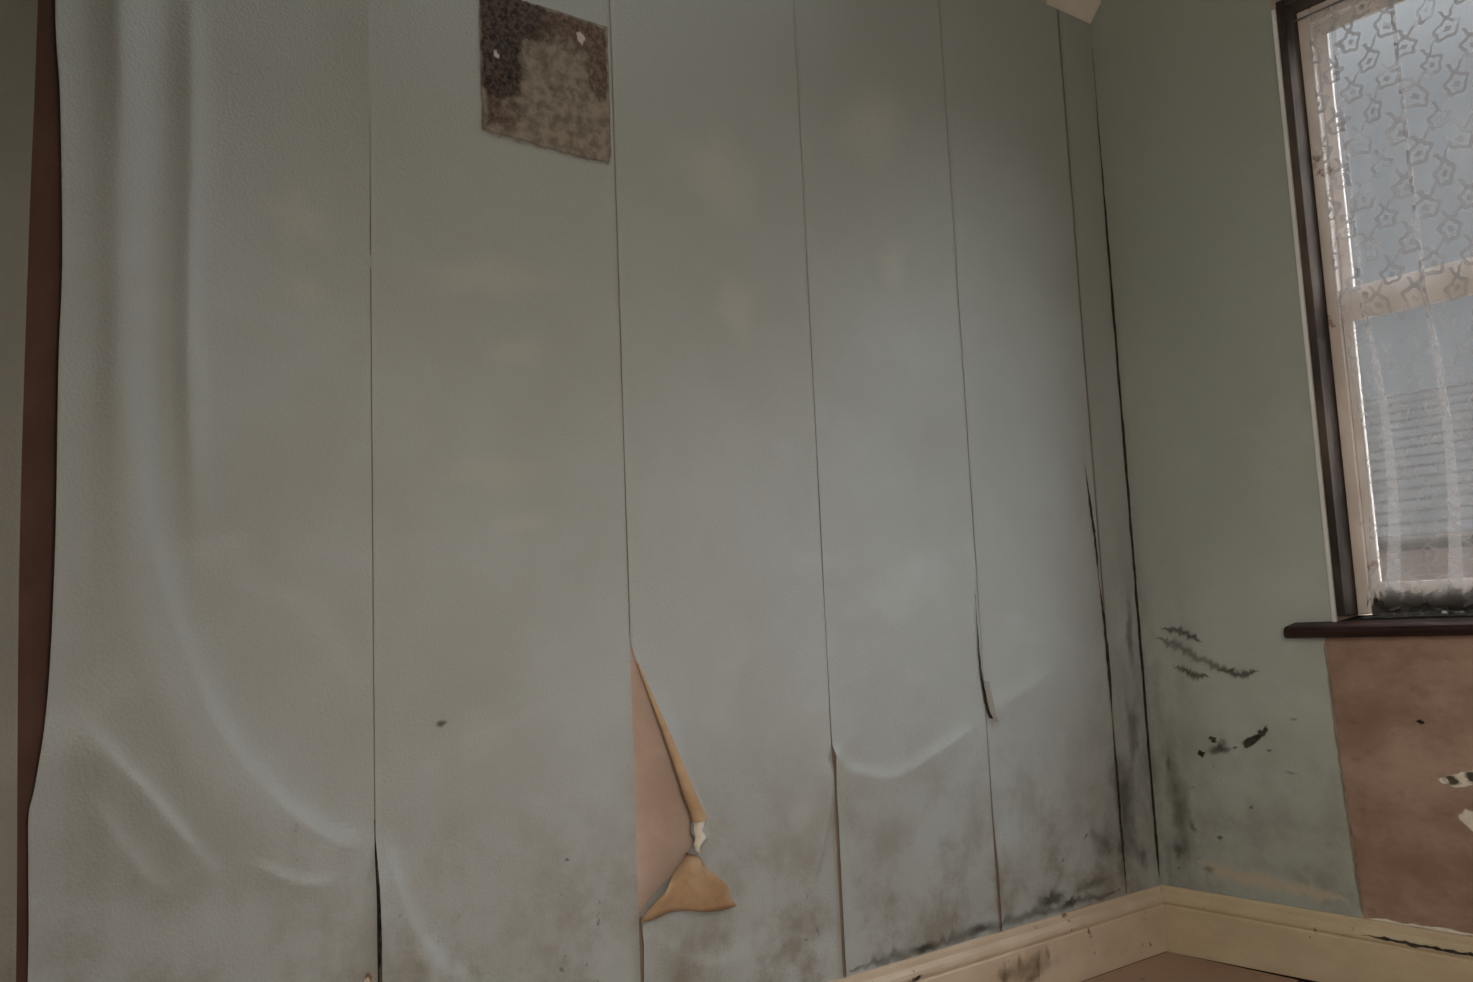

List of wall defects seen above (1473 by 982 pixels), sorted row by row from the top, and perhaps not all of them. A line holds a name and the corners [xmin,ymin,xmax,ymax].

peeling [480,0,611,163]
leakage [1174,666,1260,678]
leakage [1198,726,1271,757]
peeling [1325,635,1473,936]